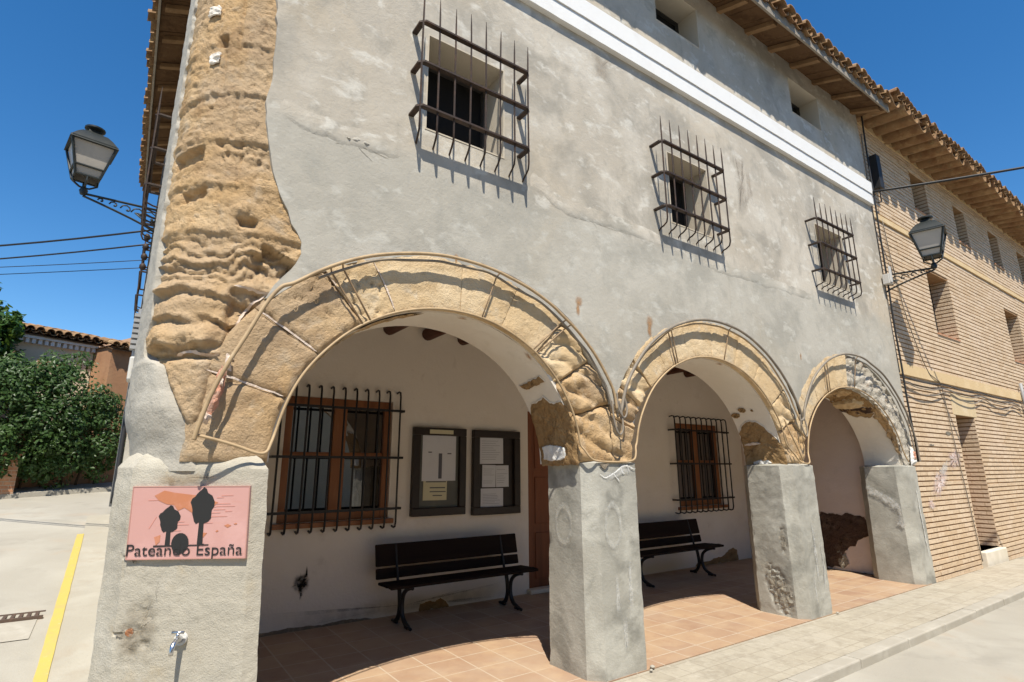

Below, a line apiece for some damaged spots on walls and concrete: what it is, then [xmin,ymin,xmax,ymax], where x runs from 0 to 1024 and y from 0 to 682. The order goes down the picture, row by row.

peeling [520,376,579,466]
peeling [731,408,788,465]